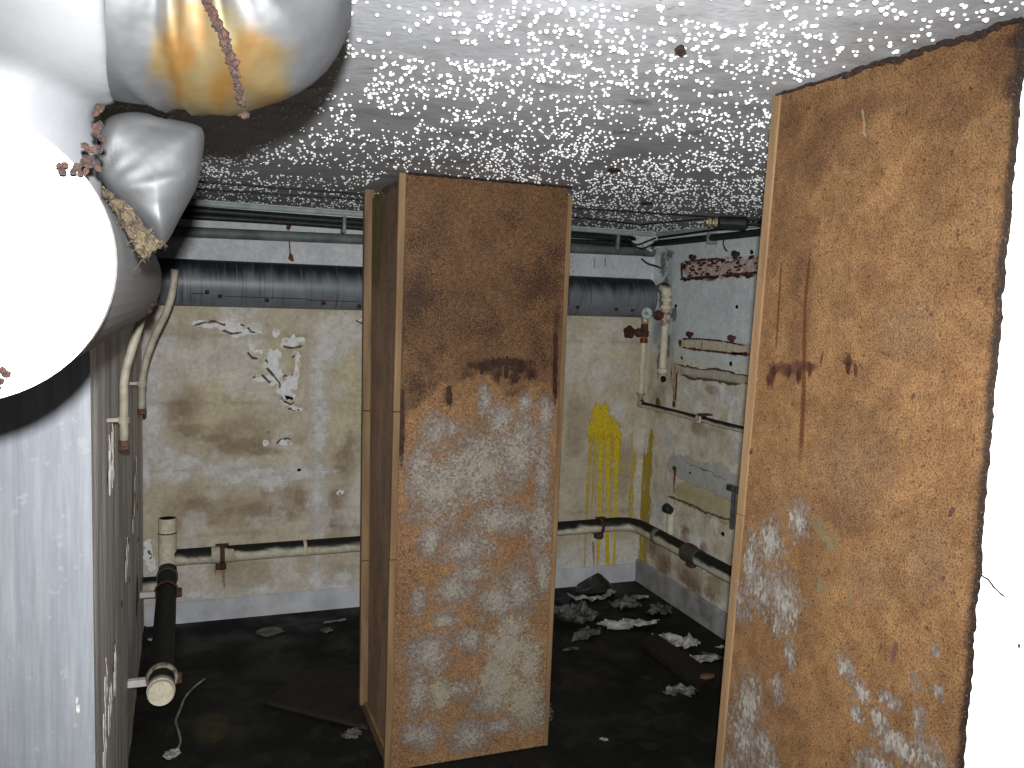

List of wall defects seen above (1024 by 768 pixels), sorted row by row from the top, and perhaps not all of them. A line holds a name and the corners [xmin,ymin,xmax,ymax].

leakage [142,334,338,539]
peeling [191,318,305,412]
leakage [374,178,584,750]
leakage [734,518,800,672]
leakage [789,508,804,545]
corrosion [800,260,810,446]
leakage [723,675,783,768]
mould [838,660,941,768]